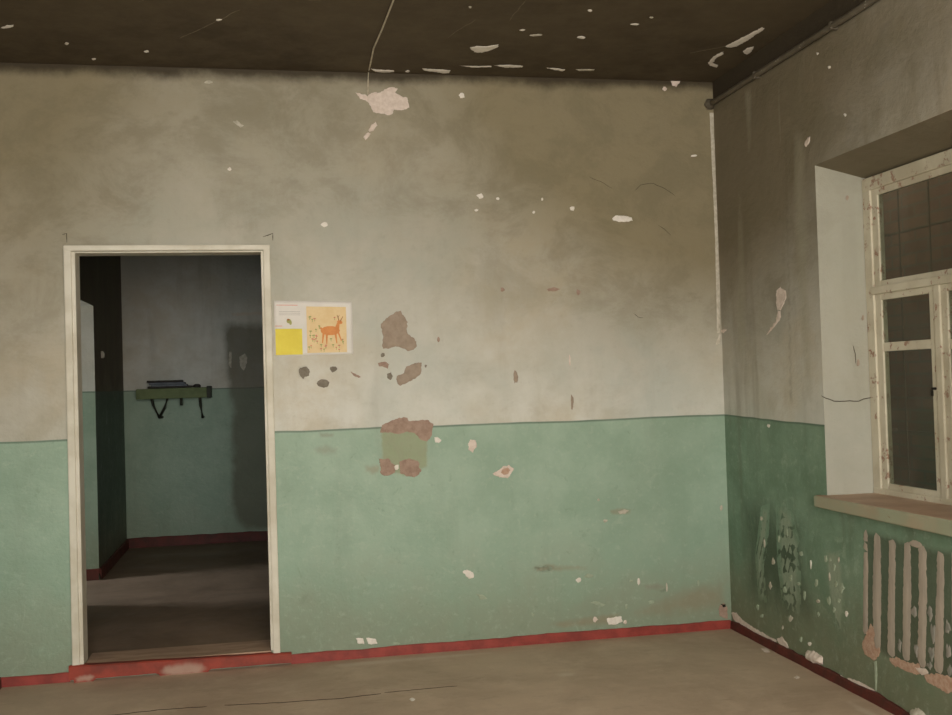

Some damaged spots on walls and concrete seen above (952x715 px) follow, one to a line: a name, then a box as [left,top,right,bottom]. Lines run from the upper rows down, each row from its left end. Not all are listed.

peeling [470,45,498,53]
peeling [692,27,764,68]
flaking render [356,87,409,140]
peeling [766,287,786,335]
flaking render [378,311,427,386]
flaking render [493,465,514,478]
leakage [534,470,849,654]
flaking render [719,603,793,648]
leakage [737,632,803,681]
flaking render [799,636,823,665]
flaking render [841,619,952,694]